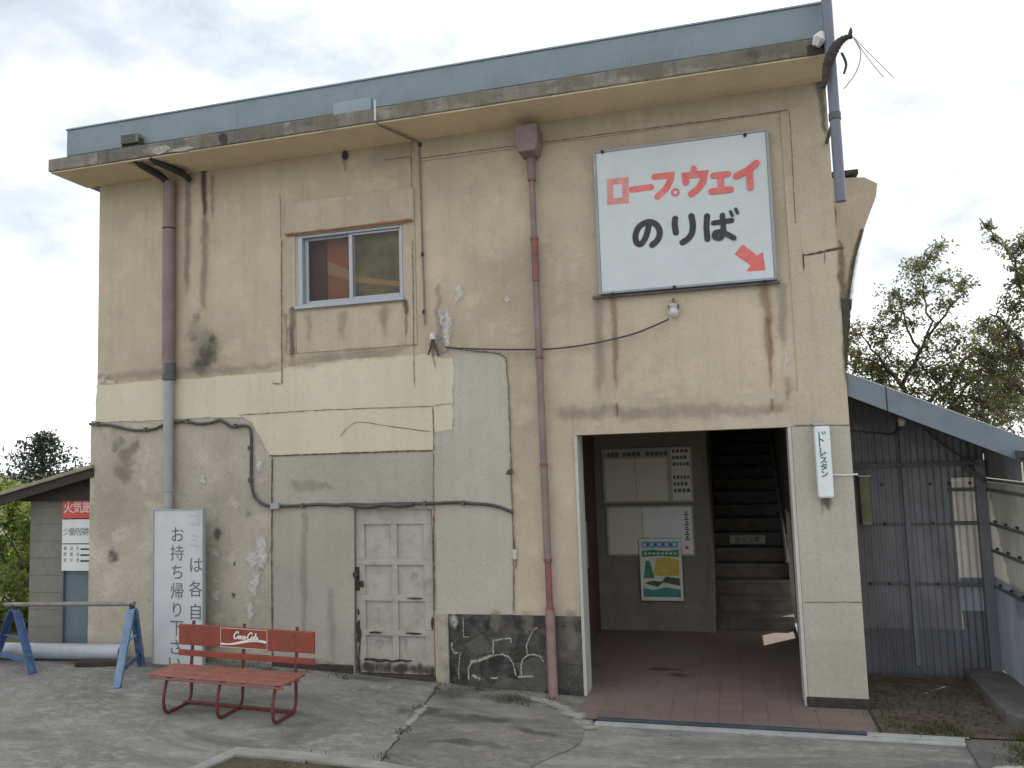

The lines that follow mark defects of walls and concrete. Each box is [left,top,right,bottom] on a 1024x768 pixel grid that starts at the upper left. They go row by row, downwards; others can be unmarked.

damp [188,171,213,339]
peeling [435,285,463,354]
peeling [233,535,267,619]